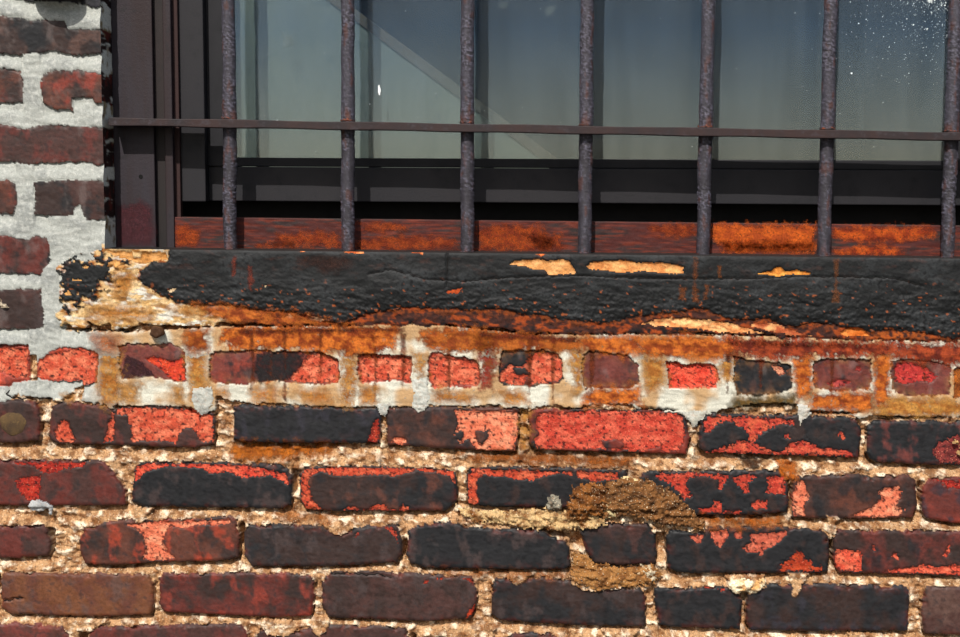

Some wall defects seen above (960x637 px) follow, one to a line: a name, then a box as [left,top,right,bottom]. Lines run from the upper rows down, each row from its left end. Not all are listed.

corrosion [478,224,563,256]
corrosion [712,223,814,253]
corrosion [833,226,932,255]
corrosion [92,272,153,321]
flaking render [55,243,960,344]
spalling [0,347,98,386]
corrosion [93,336,142,406]
spalling [288,353,340,383]
spalling [358,354,411,382]
spalling [499,352,563,386]
corrosion [172,303,960,469]
spalling [666,362,718,388]